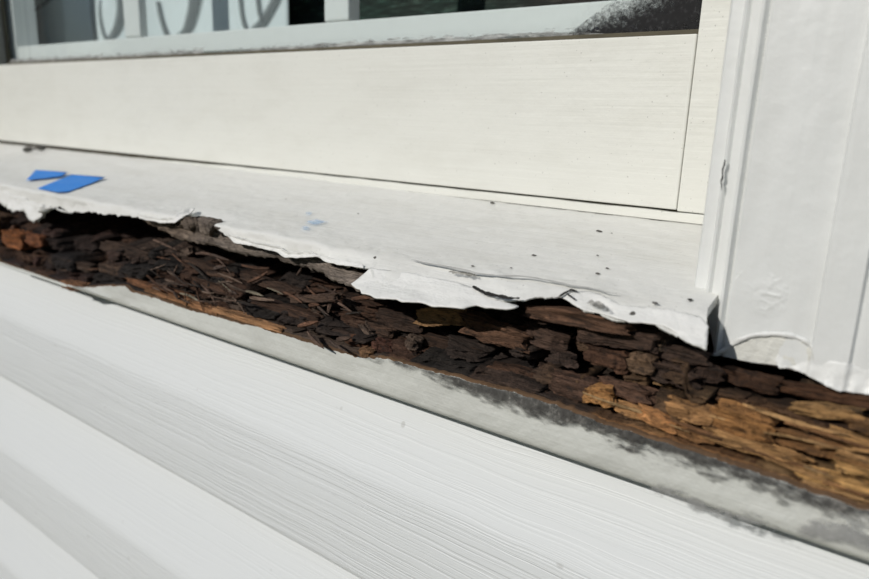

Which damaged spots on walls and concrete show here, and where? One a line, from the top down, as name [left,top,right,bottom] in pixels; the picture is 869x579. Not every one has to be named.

peeling [0,190,72,223]
peeling [137,208,195,224]
peeling [224,232,519,310]
peeling [561,291,869,395]
damp [393,361,869,550]